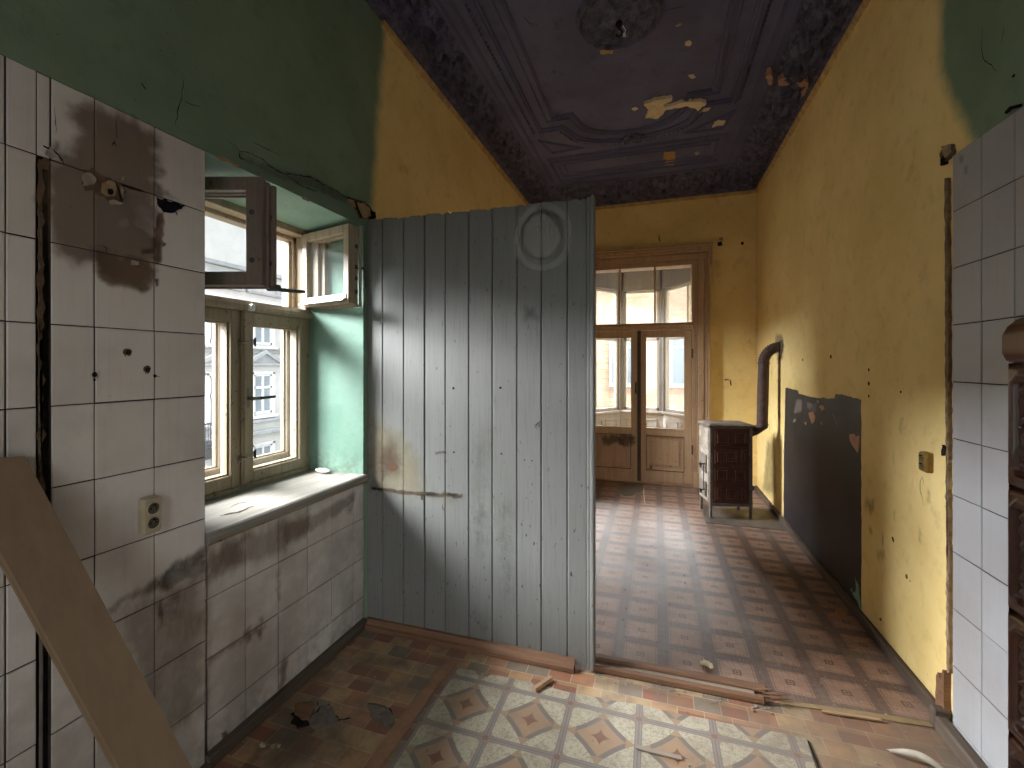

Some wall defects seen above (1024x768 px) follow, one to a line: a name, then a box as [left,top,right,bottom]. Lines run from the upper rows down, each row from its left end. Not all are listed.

peeling [766,67,809,98]
peeling [632,95,726,128]
water stain [43,108,162,290]
spalling [81,168,186,216]
crack [226,139,346,197]
spalling [347,197,376,220]
flaking render [939,144,957,674]